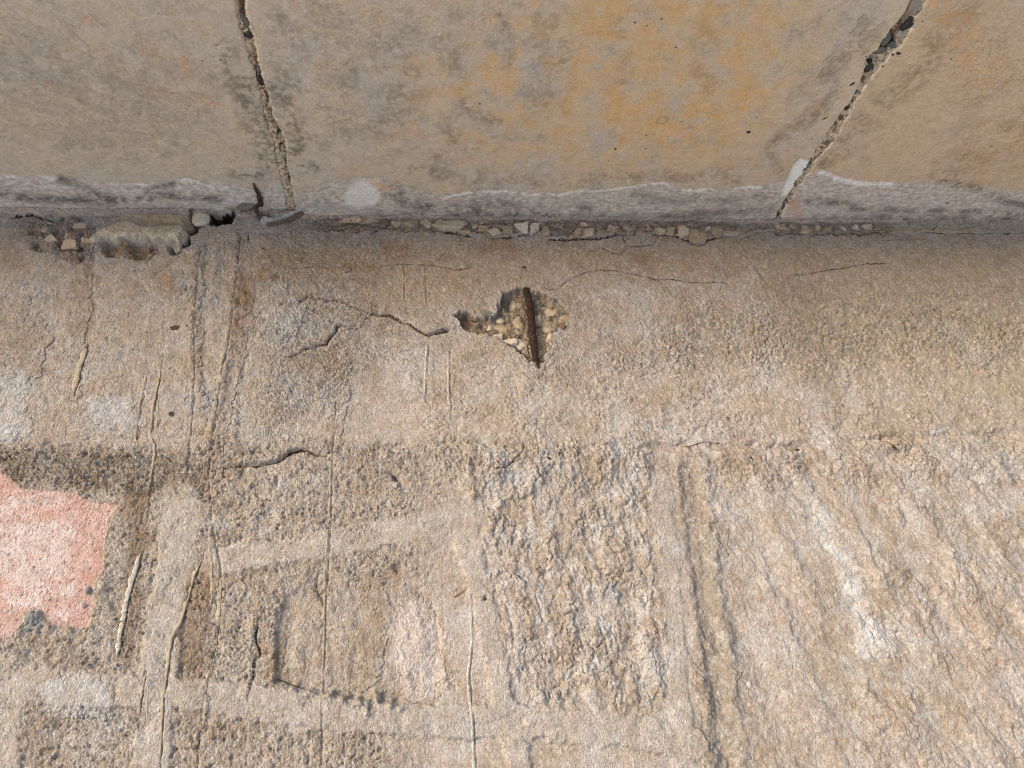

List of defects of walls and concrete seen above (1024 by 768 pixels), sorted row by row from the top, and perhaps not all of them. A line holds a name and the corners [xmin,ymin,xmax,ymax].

flaking render [21,217,158,265]
peeling [260,209,305,228]
crack [755,222,1024,276]
crack [286,228,769,357]
spalling [454,288,570,368]
rust [523,287,549,382]
crack [223,449,326,470]